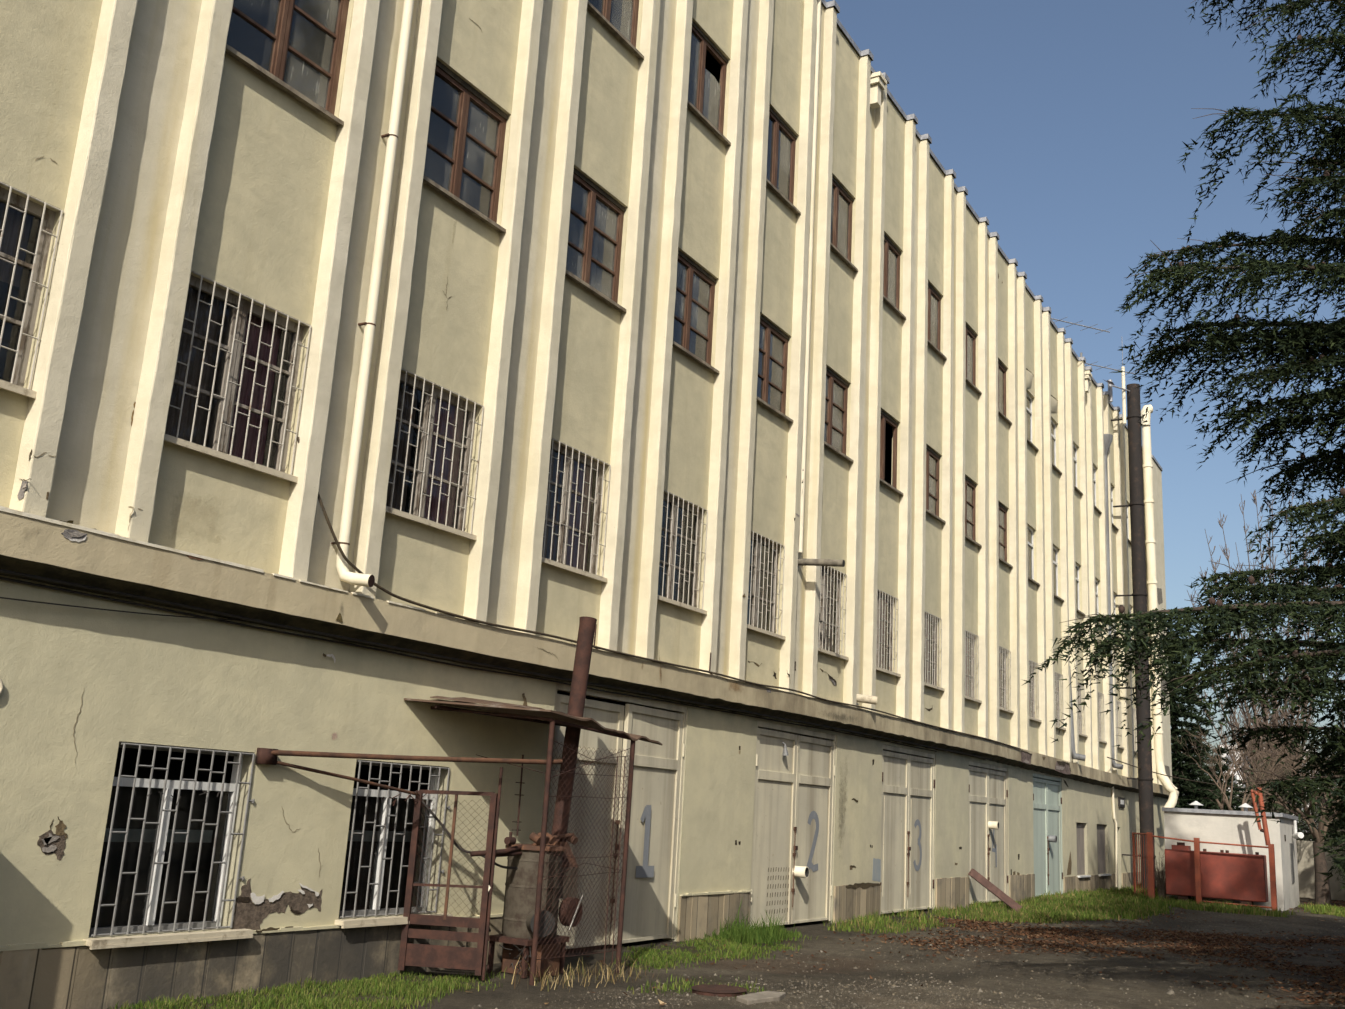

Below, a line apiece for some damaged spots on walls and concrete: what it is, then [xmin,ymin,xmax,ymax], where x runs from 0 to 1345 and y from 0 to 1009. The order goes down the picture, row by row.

crack [73,692,84,759]
spalling [37,817,68,860]
flaking render [232,878,322,930]